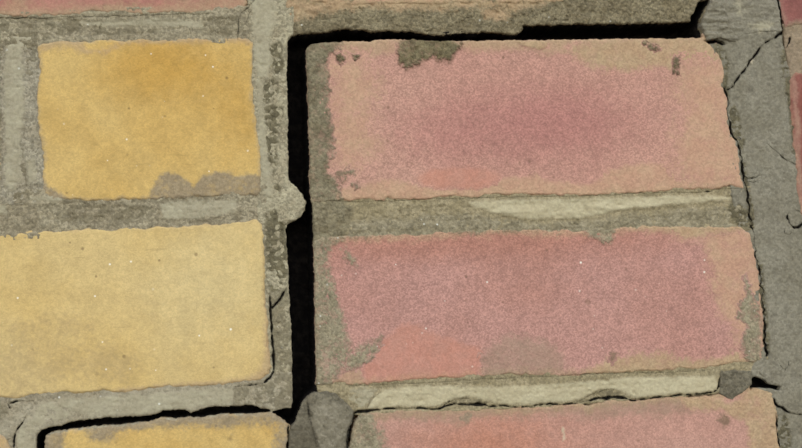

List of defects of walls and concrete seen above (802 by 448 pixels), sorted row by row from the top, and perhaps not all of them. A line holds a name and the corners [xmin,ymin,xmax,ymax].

spalling [0,13,185,205]
spalling [13,140,161,229]
crack [275,0,708,434]
crack [579,0,800,447]
crack [264,288,287,383]
crack [37,405,275,448]
crack [346,369,720,448]